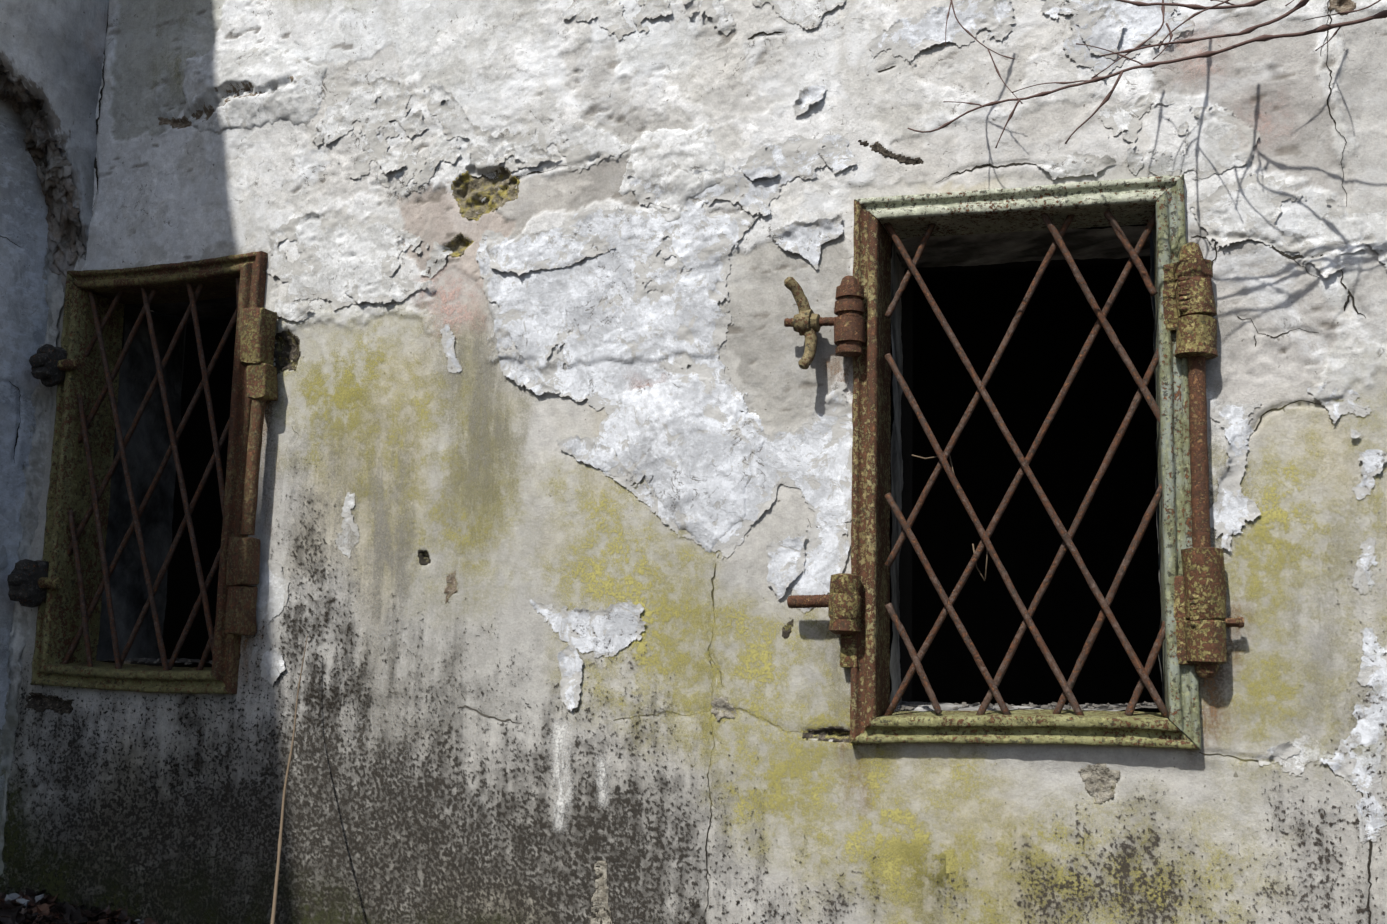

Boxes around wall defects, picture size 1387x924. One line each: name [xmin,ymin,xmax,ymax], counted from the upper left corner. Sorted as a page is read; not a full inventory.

flaking render [158,81,270,129]
peeling [562,0,738,40]
peeling [752,0,846,30]
crack [1320,0,1347,207]
peeling [266,77,924,639]
leakage [0,448,984,924]
peeling [529,599,646,711]
crack [615,564,799,924]
leakage [984,682,1387,924]
peeling [1256,627,1387,843]
crack [1356,785,1373,924]